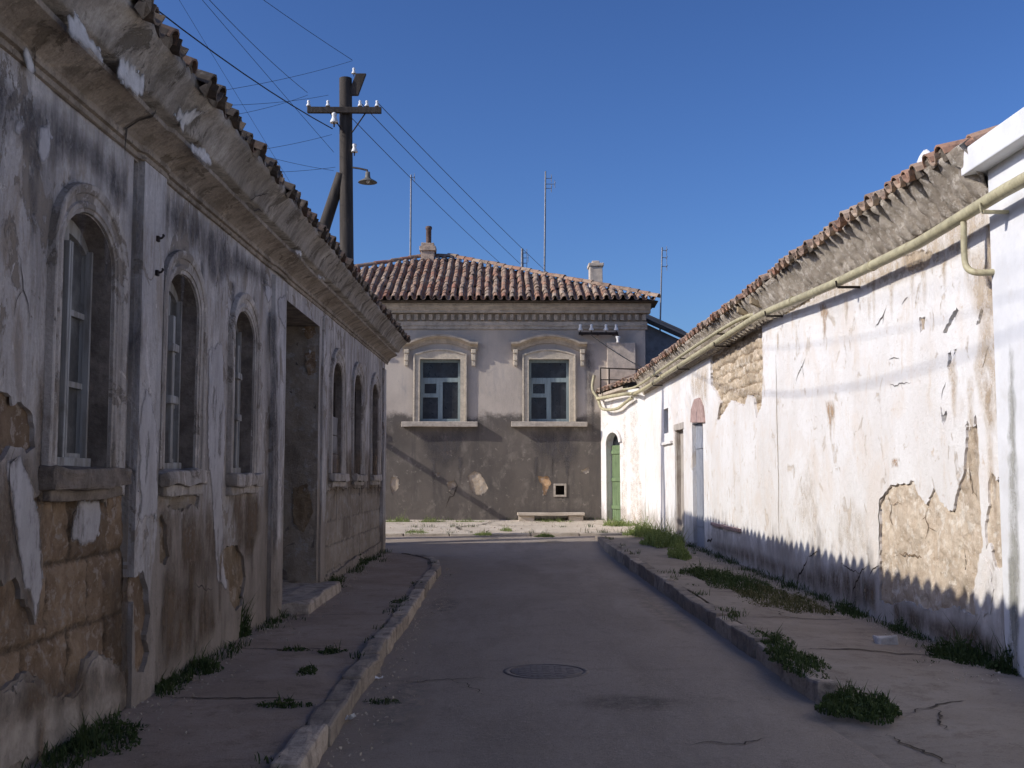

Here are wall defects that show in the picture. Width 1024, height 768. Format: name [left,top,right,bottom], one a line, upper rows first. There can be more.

leakage [167,206,265,285]
flaking render [712,327,763,419]
leakage [972,248,995,375]
flaking render [0,386,148,768]
flaking render [447,471,488,496]
flaking render [538,476,551,496]
flaking render [881,419,1002,617]
leakage [894,374,1019,674]